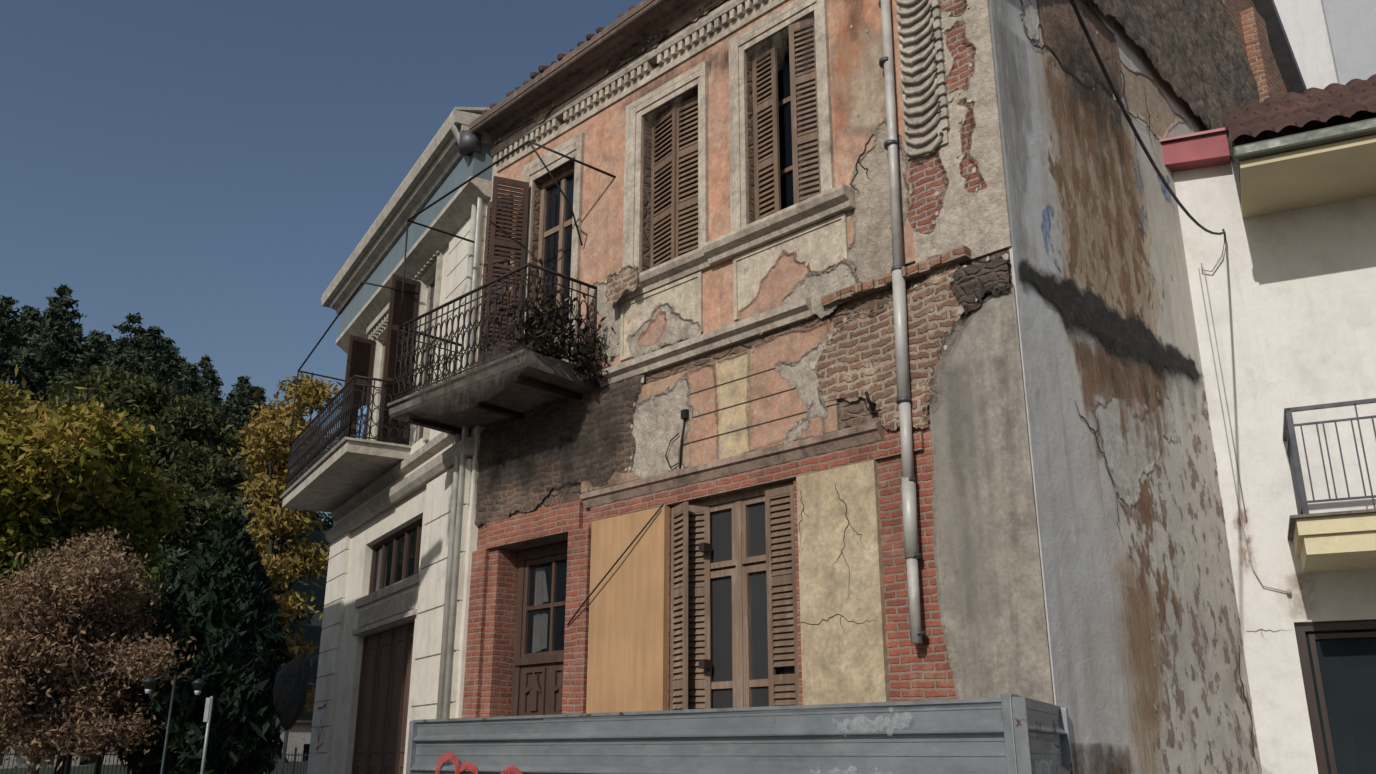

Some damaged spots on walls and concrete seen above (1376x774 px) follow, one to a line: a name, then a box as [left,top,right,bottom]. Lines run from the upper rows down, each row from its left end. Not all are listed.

flaking render [737,0,1011,444]
leakage [993,0,1028,199]
peeling [1020,0,1196,336]
leakage [1017,221,1202,382]
crack [801,484,874,634]
crack [1075,401,1127,547]
peeling [1094,391,1257,774]